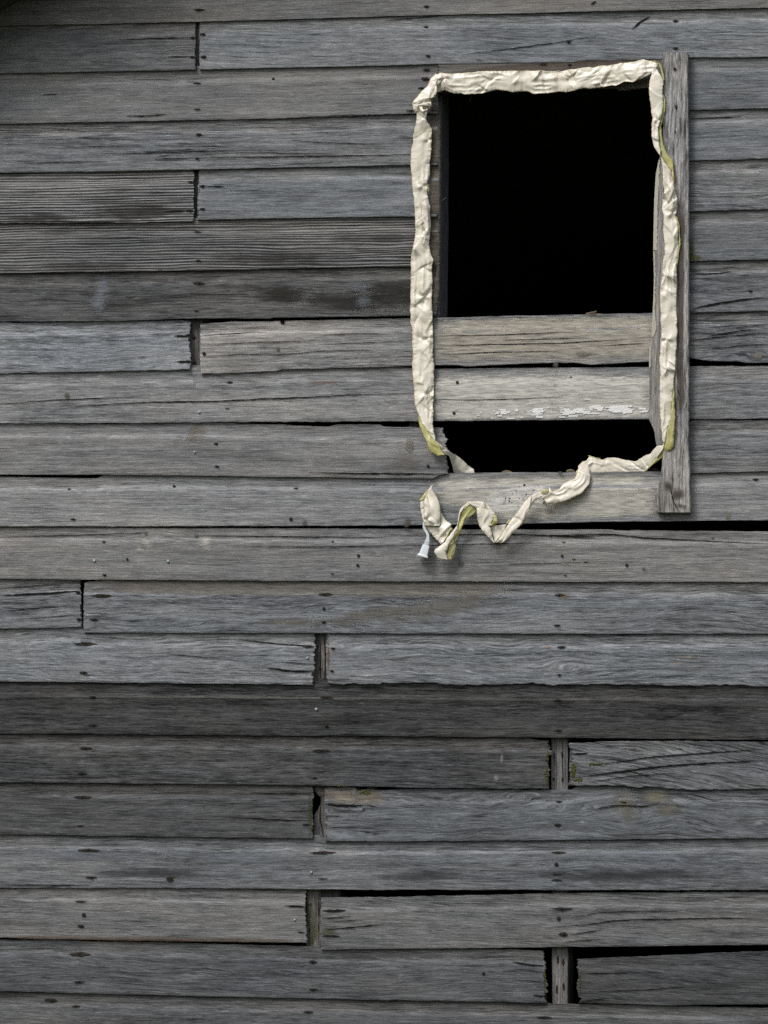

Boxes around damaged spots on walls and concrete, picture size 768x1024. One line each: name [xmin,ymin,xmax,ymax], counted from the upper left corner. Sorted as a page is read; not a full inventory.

peeling [477,399,648,419]
crack [562,740,768,810]